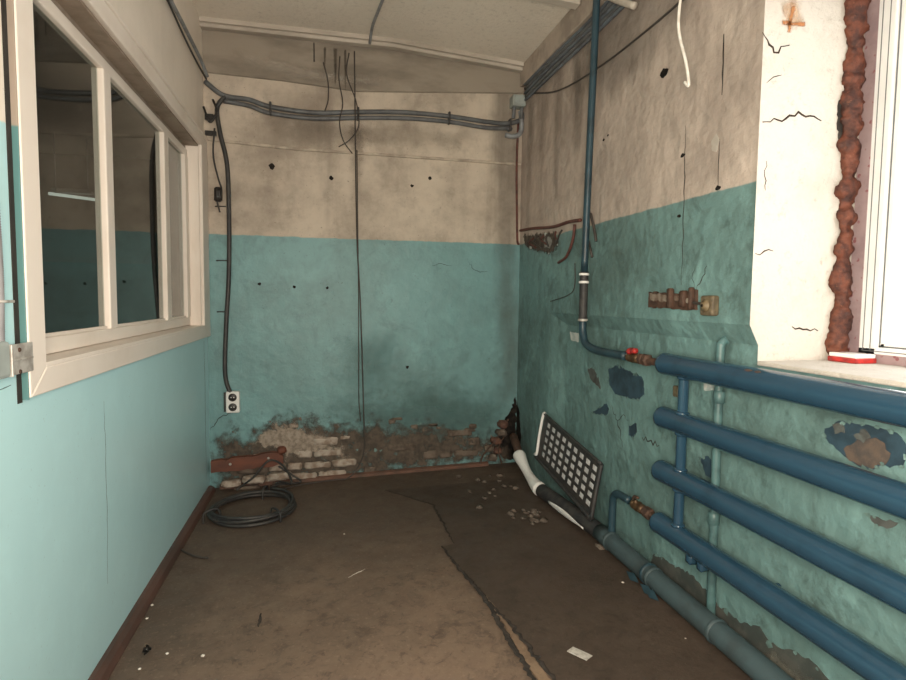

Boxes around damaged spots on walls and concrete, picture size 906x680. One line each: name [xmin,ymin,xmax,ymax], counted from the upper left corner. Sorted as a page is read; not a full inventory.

peeling [588,364,644,402]
peeling [592,404,609,416]
flaking render [216,398,521,488]
peeling [821,420,906,472]
flaking render [650,553,829,680]